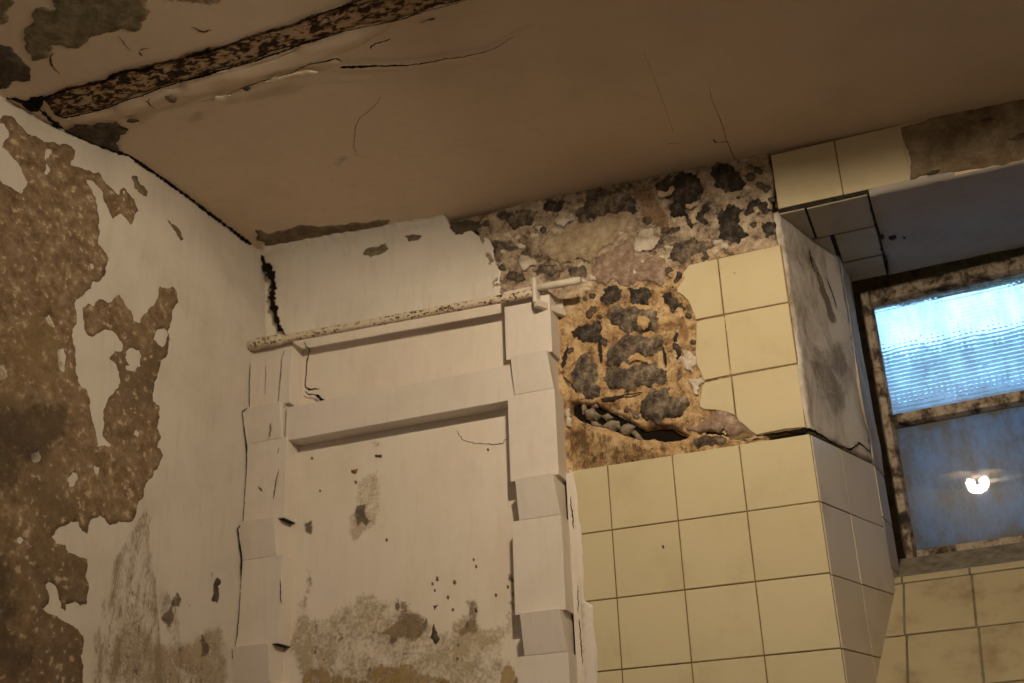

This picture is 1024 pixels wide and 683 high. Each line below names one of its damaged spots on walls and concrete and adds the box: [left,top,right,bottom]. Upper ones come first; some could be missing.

flaking render [0,0,150,89]
crack [6,96,324,658]
flaking render [0,21,396,683]
spalling [448,154,778,474]
water stain [809,250,837,320]
crack [753,428,870,452]
water stain [95,556,227,683]
water stain [291,576,498,683]
water stain [495,663,516,683]